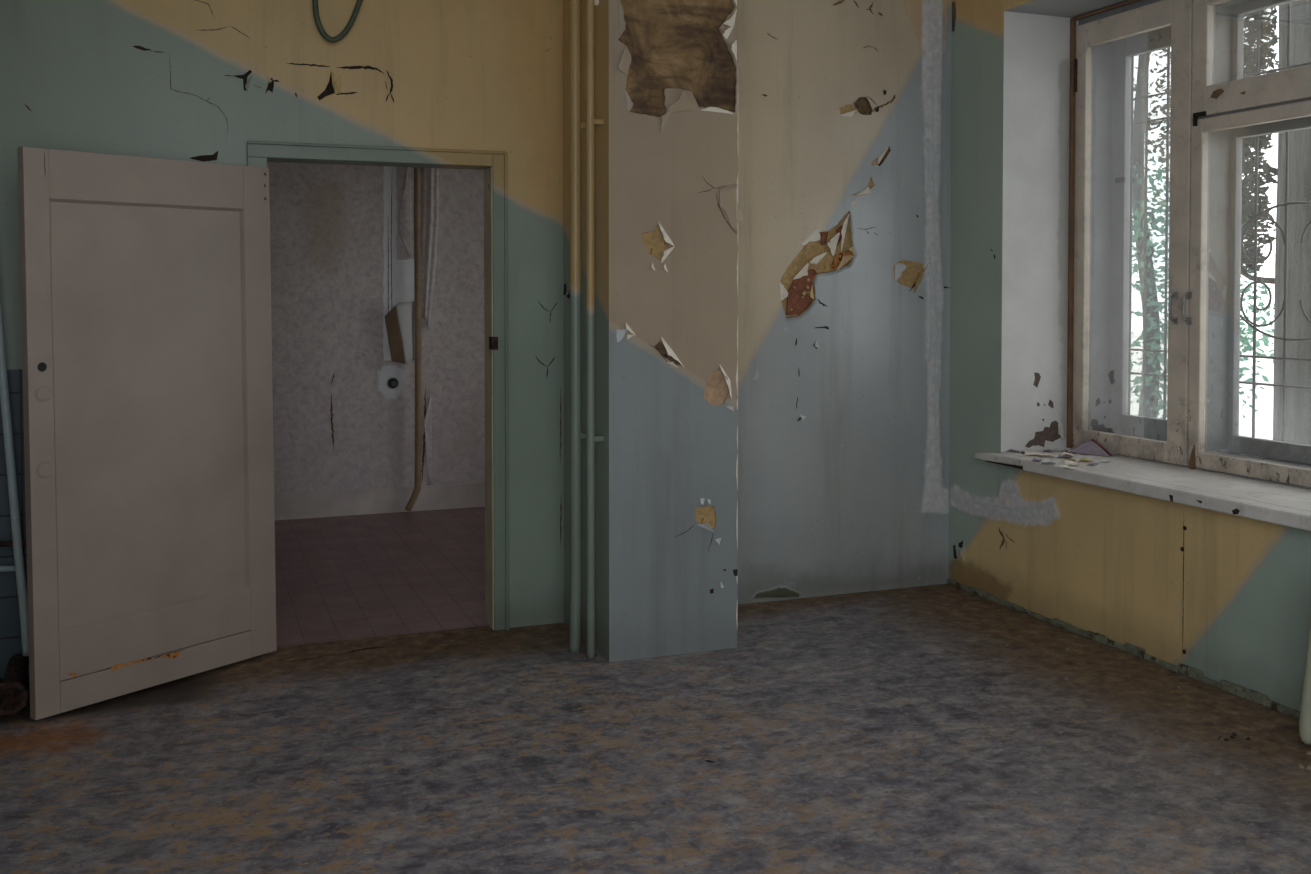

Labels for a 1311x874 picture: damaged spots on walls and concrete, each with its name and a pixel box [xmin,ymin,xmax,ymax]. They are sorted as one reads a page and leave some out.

crack [195,0,249,38]
crack [133,46,228,138]
crack [287,63,394,102]
flaking render [615,0,740,145]
flaking render [839,89,896,117]
peeling [638,221,675,273]
peeling [777,147,891,332]
peeling [893,260,930,293]
peeling [654,337,685,368]
peeling [675,321,738,551]
peeling [1025,372,1117,457]
peeling [710,569,738,629]